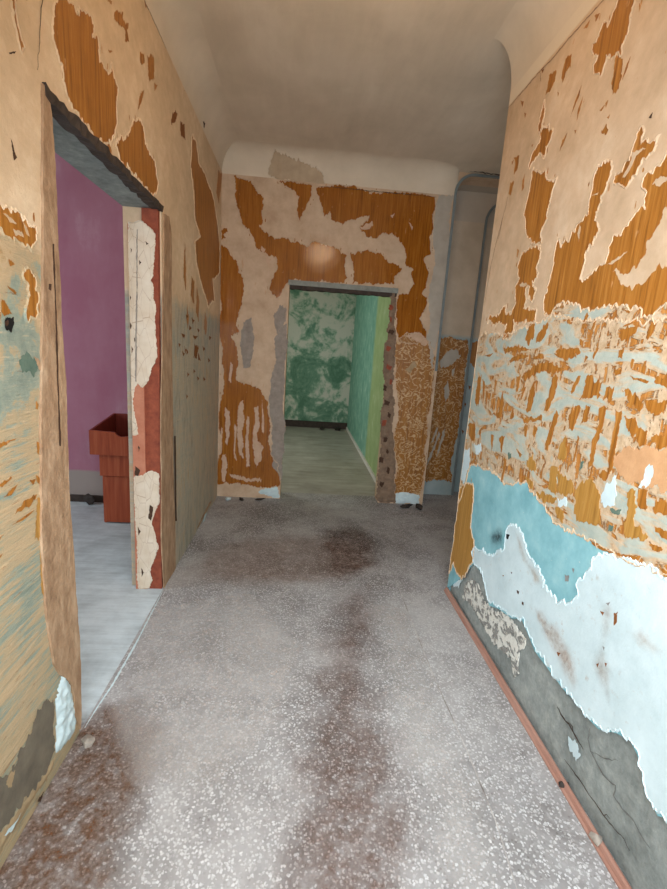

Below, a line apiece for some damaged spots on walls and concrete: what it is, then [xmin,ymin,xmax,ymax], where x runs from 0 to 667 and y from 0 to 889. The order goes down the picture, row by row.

peeling [9,0,25,55]
peeling [51,0,159,196]
peeling [584,0,643,135]
peeling [0,202,38,253]
peeling [128,220,157,449]
peeling [171,110,281,489]
peeling [486,54,667,341]
peeling [134,466,160,589]
spalling [233,146,667,889]
spalling [0,699,55,854]